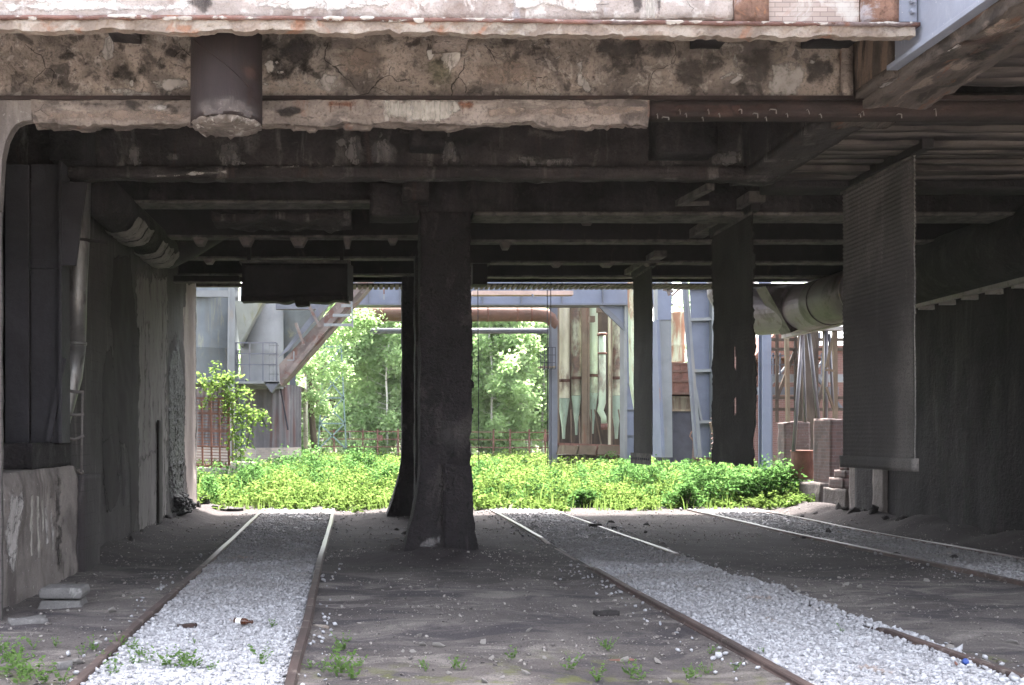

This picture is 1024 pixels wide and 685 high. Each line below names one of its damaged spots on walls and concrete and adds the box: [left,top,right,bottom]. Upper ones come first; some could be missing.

crack [324,45,410,95]
crack [451,45,498,95]
water stain [598,40,833,95]